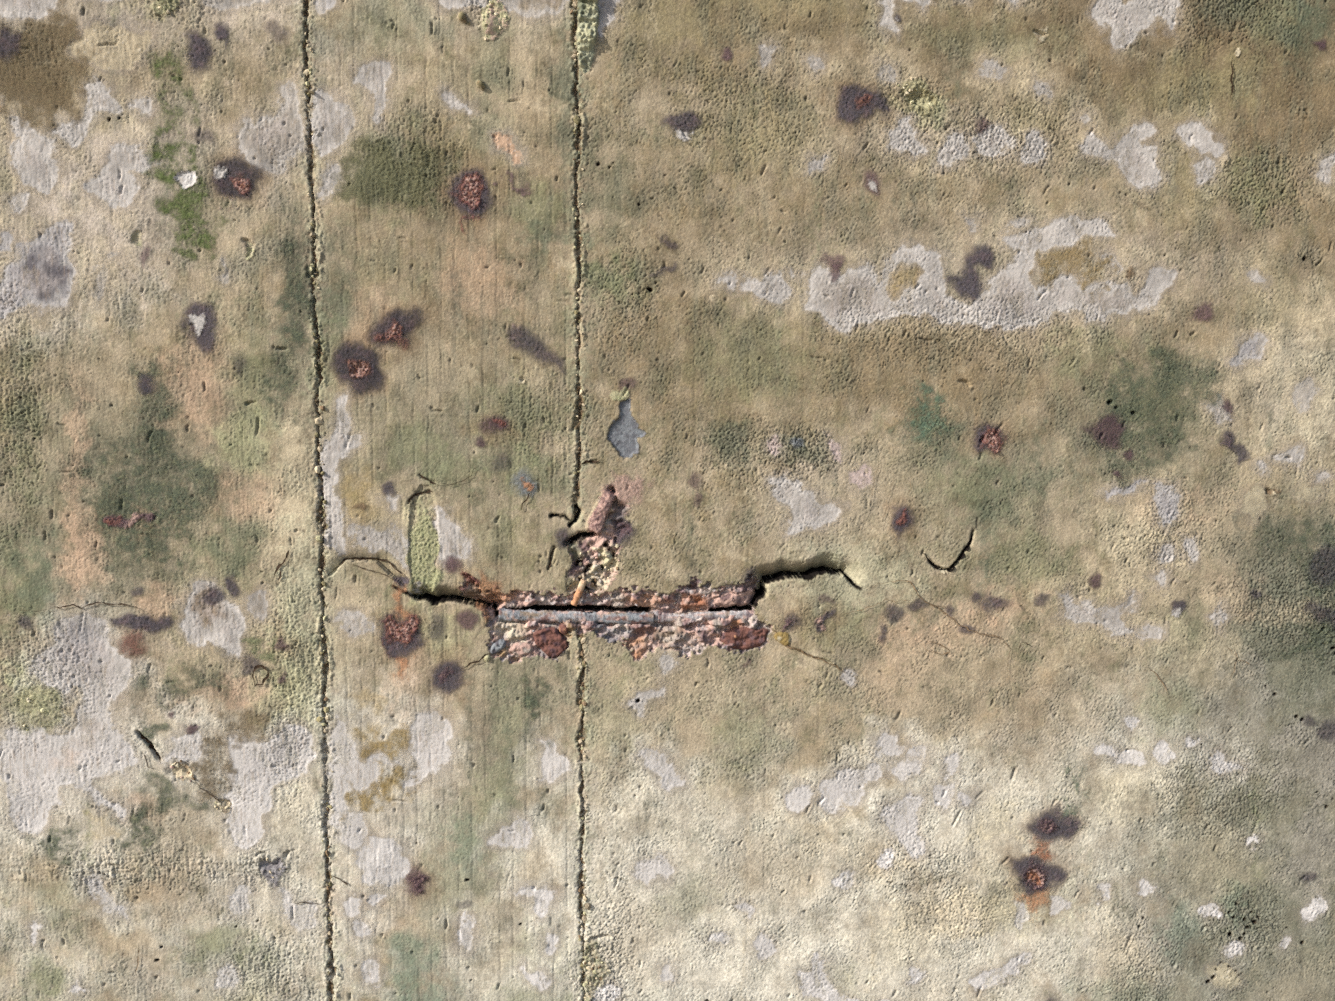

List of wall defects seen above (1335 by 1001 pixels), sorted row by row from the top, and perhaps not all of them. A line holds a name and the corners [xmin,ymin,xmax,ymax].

corrosion [212,158,261,199]
corrosion [449,170,530,231]
corrosion [333,308,420,394]
corrosion [974,425,1003,453]
crack [408,467,477,505]
corrosion [381,588,423,676]
crack [325,557,649,616]
spalling [314,383,790,719]
crack [521,493,593,572]
crack [709,528,1031,674]
corrosion [1003,808,1080,911]